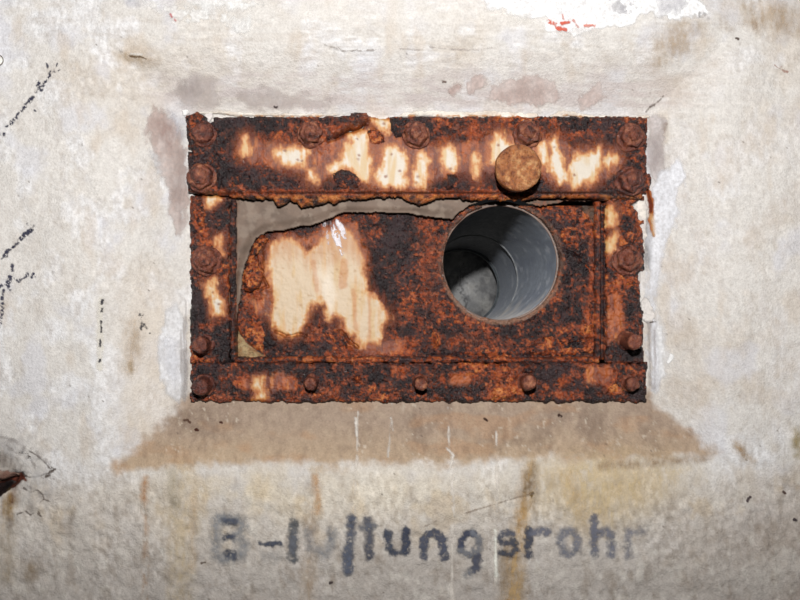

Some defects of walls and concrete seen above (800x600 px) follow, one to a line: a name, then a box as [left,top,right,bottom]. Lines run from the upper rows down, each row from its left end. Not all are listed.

peeling [484,0,709,37]
corrosion [186,112,204,141]
corrosion [367,117,407,144]
corrosion [333,169,360,188]
corrosion [446,174,459,190]
corrosion [192,200,206,228]
corrosion [618,212,639,244]
corrosion [242,235,268,292]
corrosion [238,318,265,352]
corrosion [521,301,595,356]
corrosion [491,383,518,400]